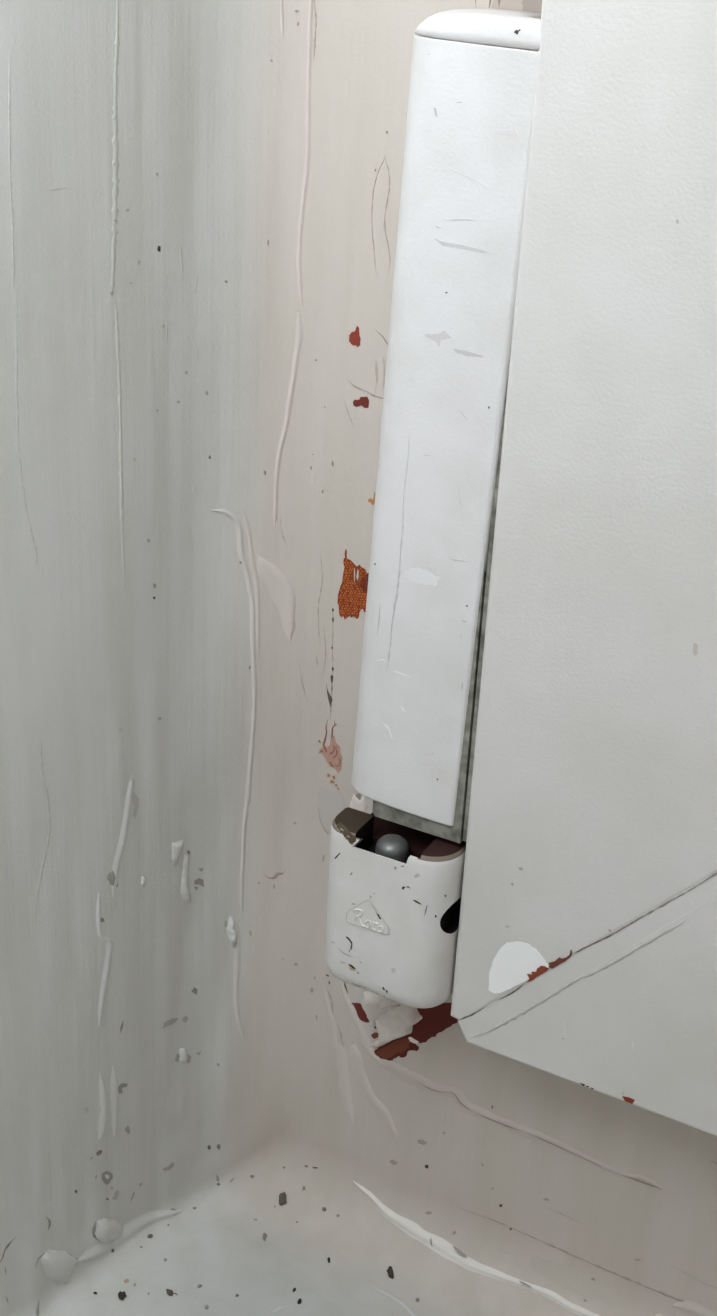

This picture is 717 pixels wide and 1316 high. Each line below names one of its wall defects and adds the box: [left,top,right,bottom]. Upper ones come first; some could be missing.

peeling [348,988,422,1048]